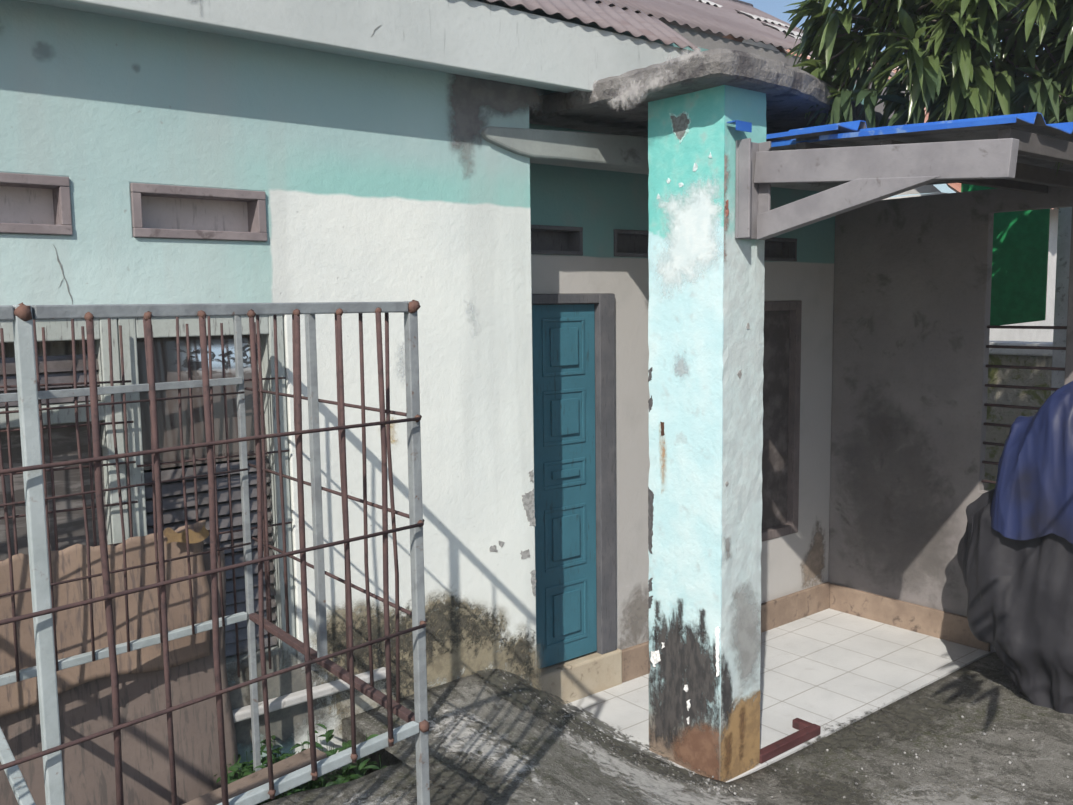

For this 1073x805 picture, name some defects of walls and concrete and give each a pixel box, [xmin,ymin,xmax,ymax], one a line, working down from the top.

spalling [669,111,691,144]
peeling [656,152,730,295]
crack [53,245,73,305]
peeling [522,469,536,526]
peeling [520,549,536,597]
leakage [227,604,414,750]
leakage [425,594,541,690]
leakage [620,588,761,748]